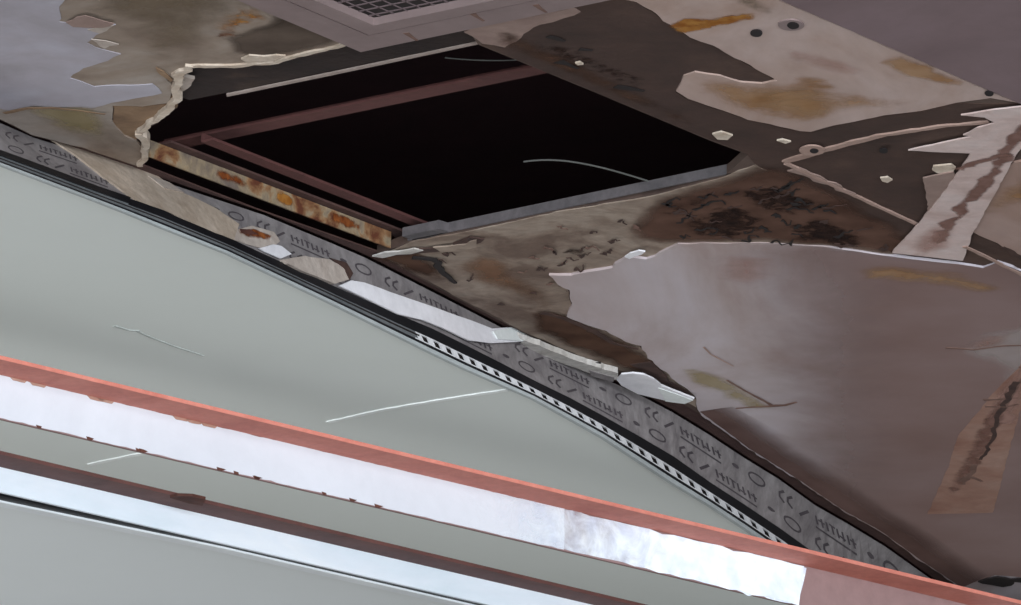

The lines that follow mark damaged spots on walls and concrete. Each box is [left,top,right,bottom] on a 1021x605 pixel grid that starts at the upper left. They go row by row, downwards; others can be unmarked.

damp [717,81,865,118]
peeling [481,0,1021,238]
peeling [148,176,184,193]
rust [218,171,244,185]
rust [333,213,359,228]
peeling [625,250,645,259]
peeling [958,232,1021,269]
peeling [338,280,533,343]
peeling [617,372,694,404]
damp [617,170,1021,587]
crack [945,343,1021,485]
flaking render [978,576,1021,587]